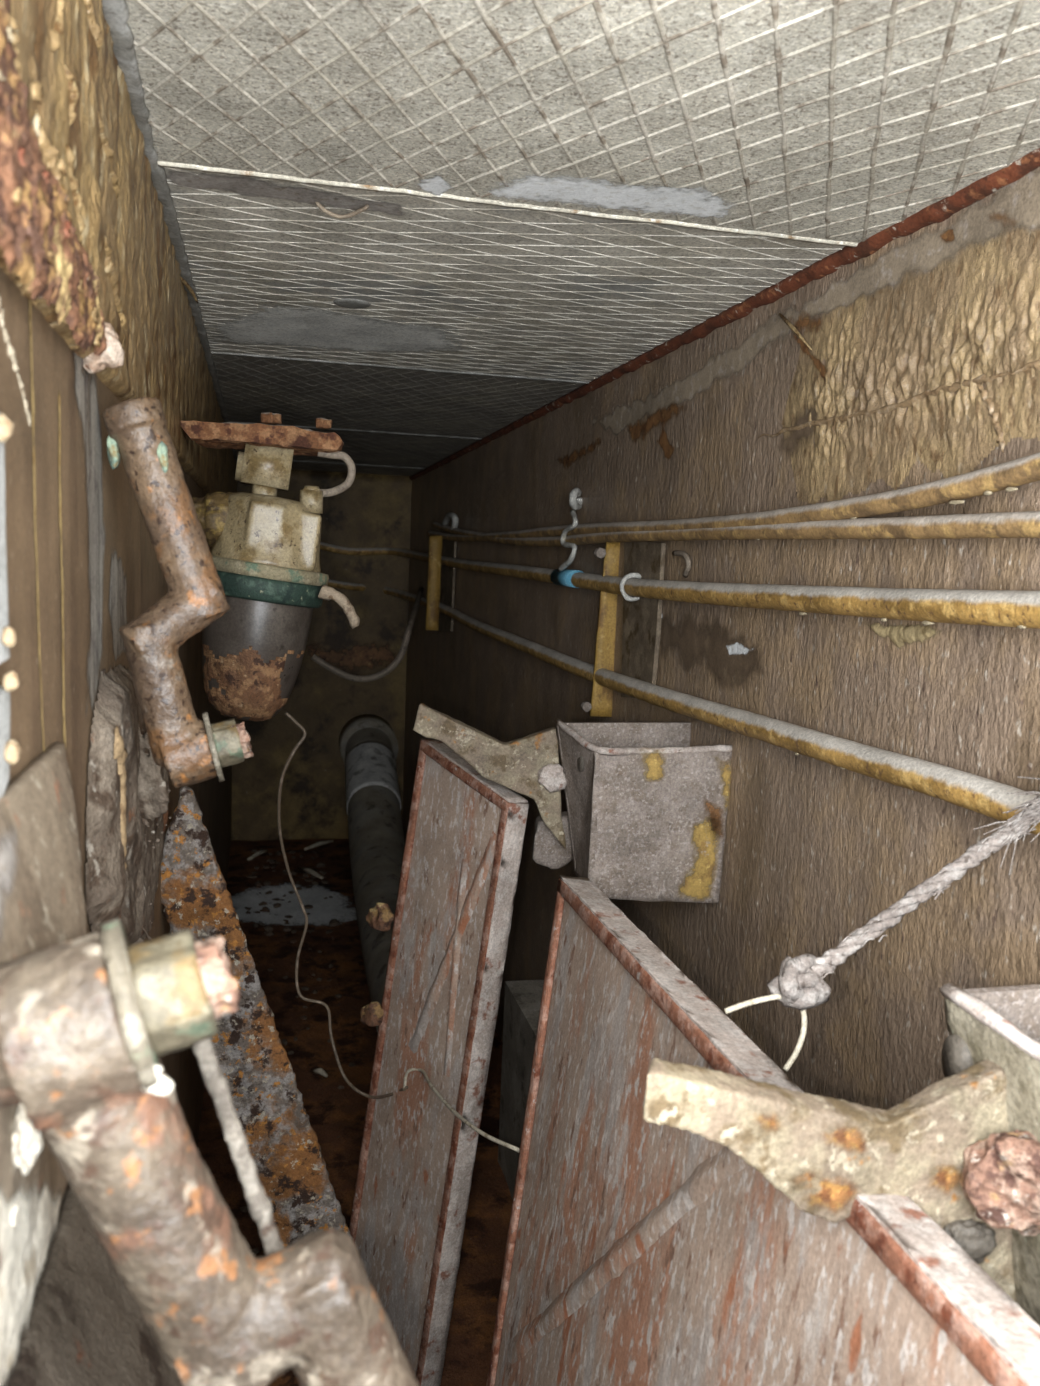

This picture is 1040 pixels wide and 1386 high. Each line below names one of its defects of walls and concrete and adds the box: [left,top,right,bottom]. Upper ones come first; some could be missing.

leakage [490,176,729,217]
corrosion [940,229,954,242]
corrosion [794,316,826,379]
corrosion [629,404,683,459]
leakage [661,615,758,685]